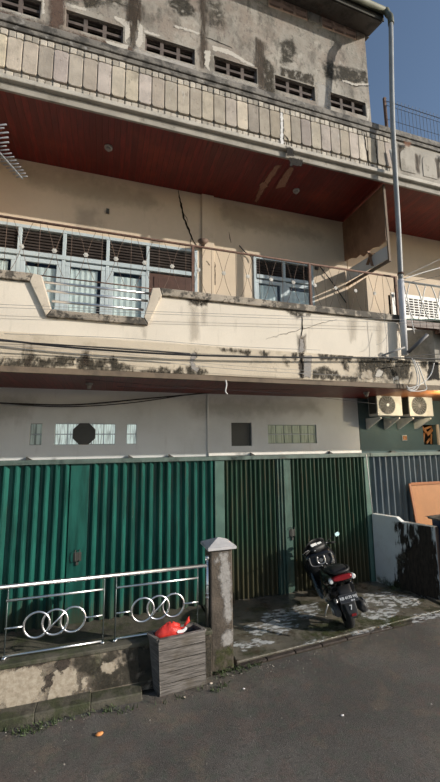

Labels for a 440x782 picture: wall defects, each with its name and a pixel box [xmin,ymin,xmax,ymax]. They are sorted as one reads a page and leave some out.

damp [49,0,74,29]
damp [84,0,141,48]
damp [170,0,224,67]
damp [255,37,314,93]
damp [324,61,368,83]
crack [178,190,196,245]
damp [0,351,208,375]
crack [267,310,337,378]
damp [313,354,357,382]
damp [352,522,440,635]
peeling [0,666,88,708]
peeling [101,661,118,674]